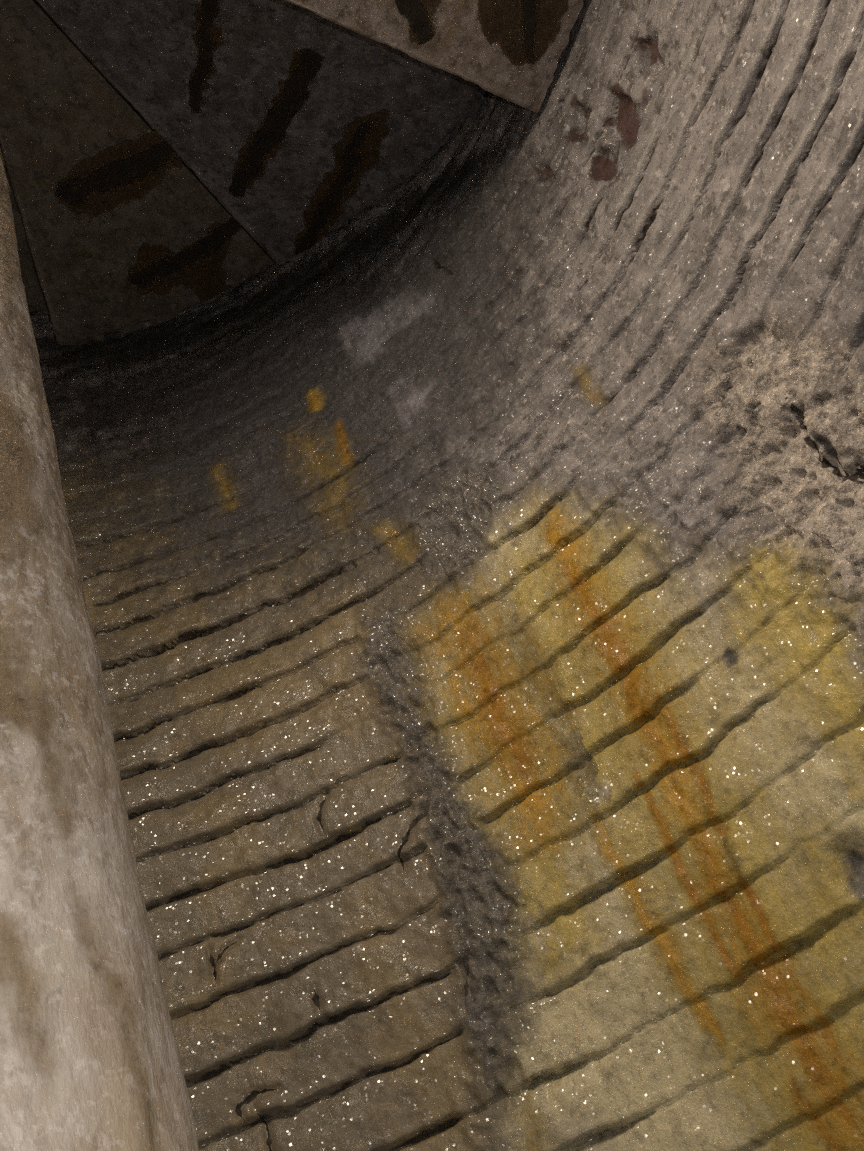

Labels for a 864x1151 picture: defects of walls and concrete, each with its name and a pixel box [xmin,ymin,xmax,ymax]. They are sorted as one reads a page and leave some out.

corrosion [308,390,323,411]
crack [798,417,864,484]
corrosion [416,591,573,852]
corrosion [541,509,864,1151]